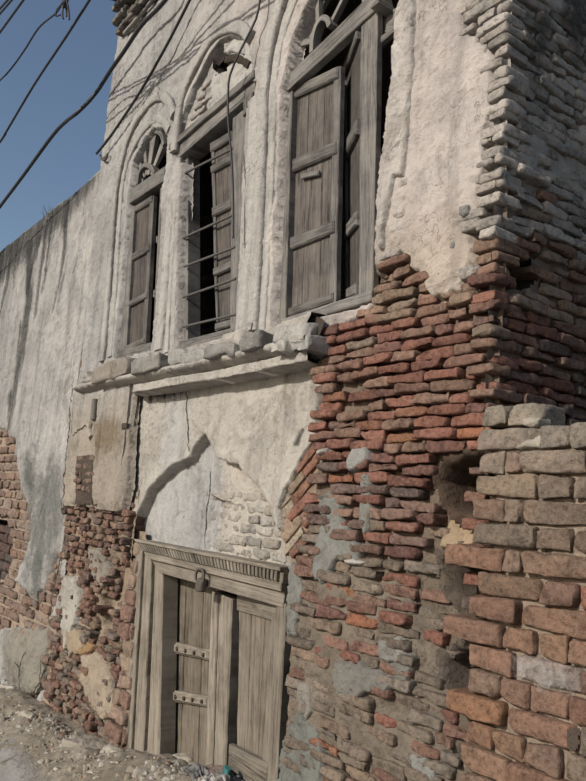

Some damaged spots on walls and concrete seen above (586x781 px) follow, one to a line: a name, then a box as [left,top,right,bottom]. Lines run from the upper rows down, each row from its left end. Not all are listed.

spalling [447,0,529,125]
spalling [447,131,524,244]
leakage [0,177,94,419]
crack [183,391,191,452]
leakage [24,455,63,603]
flaking render [0,428,145,742]
crack [204,471,231,543]
flaking render [91,248,520,781]